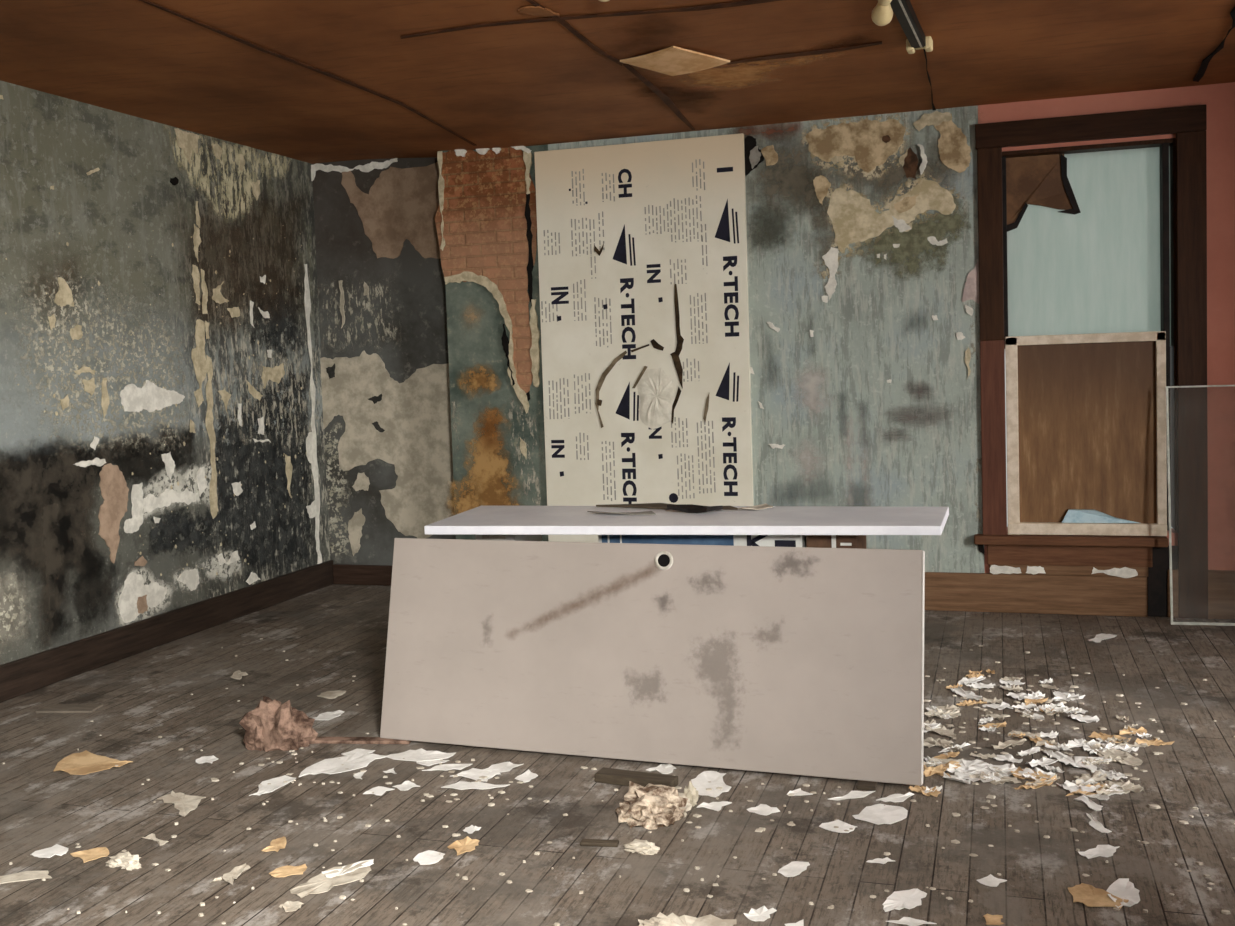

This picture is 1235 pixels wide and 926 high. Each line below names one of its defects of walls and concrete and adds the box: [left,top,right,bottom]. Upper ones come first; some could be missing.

crack [1193,7,1235,82]
spalling [802,111,971,303]
spalling [21,127,458,564]
spalling [311,146,541,506]
water stain [111,433,193,484]
water stain [267,385,290,477]
peeling [0,571,29,644]
water stain [35,494,116,647]
water stain [149,511,212,554]
peeling [115,551,260,626]